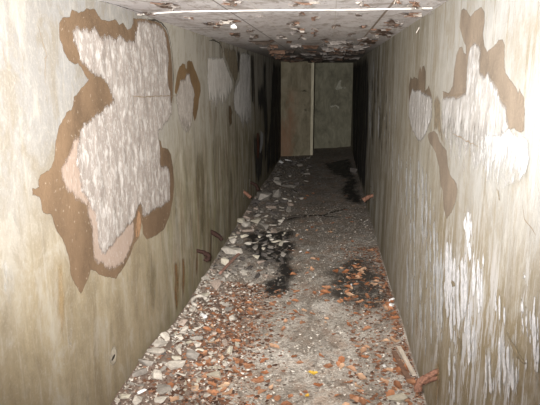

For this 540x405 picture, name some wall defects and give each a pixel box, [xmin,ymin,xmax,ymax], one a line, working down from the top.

spalling [150,1,180,11]
spalling [203,19,241,29]
peeling [230,1,433,63]
flaking render [207,53,251,123]
flaking render [409,7,529,218]
flaking render [32,8,201,293]
rust [196,230,223,274]
leakage [392,155,484,367]
leakage [521,296,539,372]
leakage [485,337,517,402]